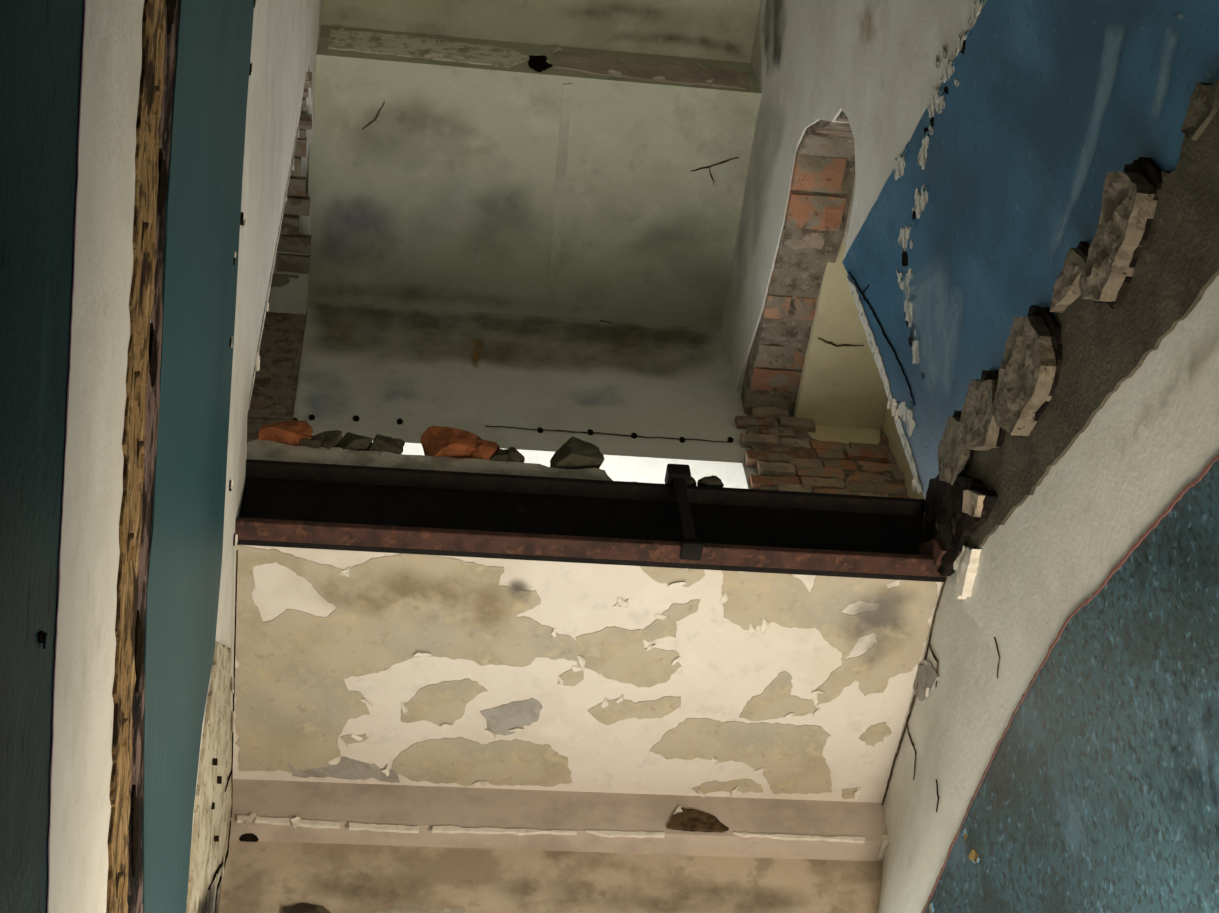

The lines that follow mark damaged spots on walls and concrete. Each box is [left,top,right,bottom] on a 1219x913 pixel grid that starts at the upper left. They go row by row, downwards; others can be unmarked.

flaking render [763,120,853,321]
peeling [894,0,983,380]
water stain [411,319,554,363]
water stain [565,326,695,369]
peeling [186,276,999,913]
crack [882,577,947,812]